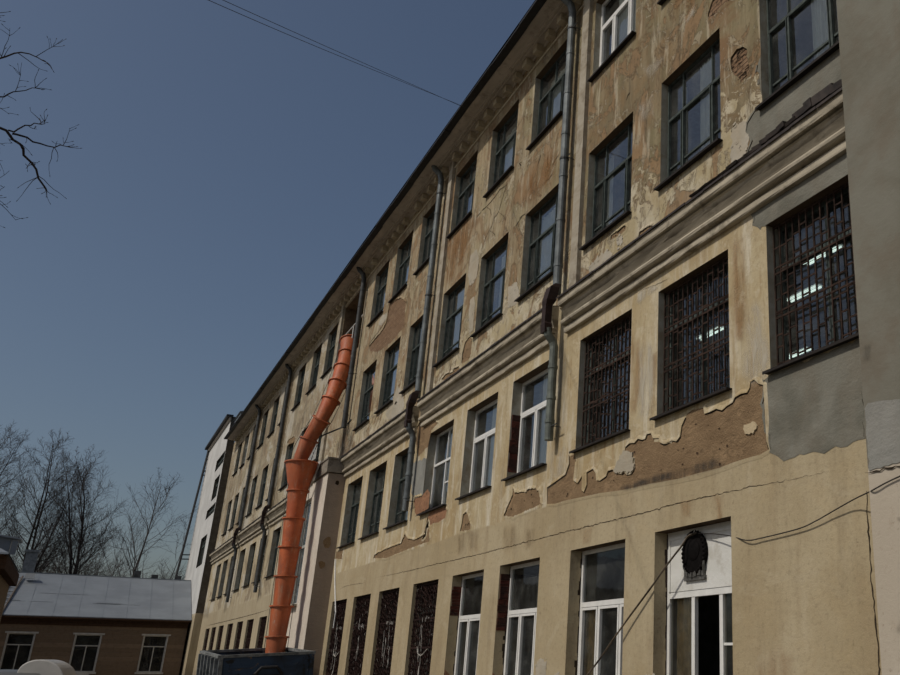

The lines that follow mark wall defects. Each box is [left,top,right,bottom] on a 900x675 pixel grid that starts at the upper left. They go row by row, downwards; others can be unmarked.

flaking render [729,42,754,87]
flaking render [730,121,749,163]
flaking render [369,296,407,354]
flaking render [503,376,770,521]
flaking render [373,489,448,561]